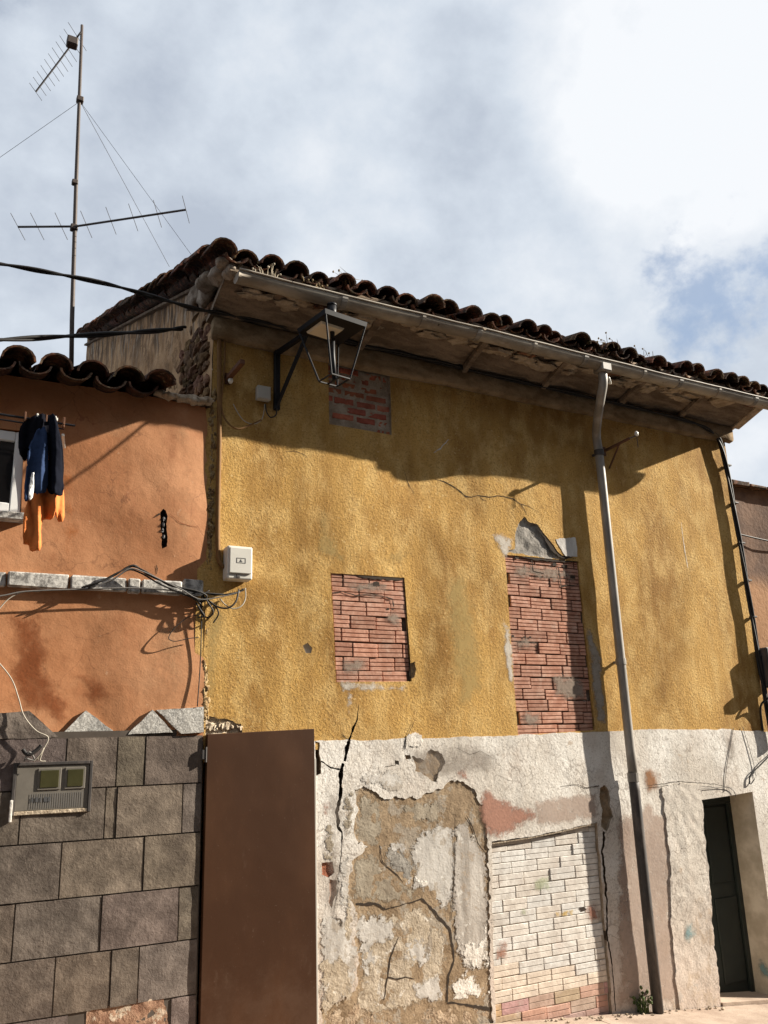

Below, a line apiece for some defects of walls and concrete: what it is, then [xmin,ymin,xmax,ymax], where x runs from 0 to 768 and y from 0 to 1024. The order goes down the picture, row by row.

crack [436,479,539,514]
flaking render [508,517,575,579]
crack [320,706,491,1012]
flaking render [318,732,494,1024]
crack [601,831,616,1011]